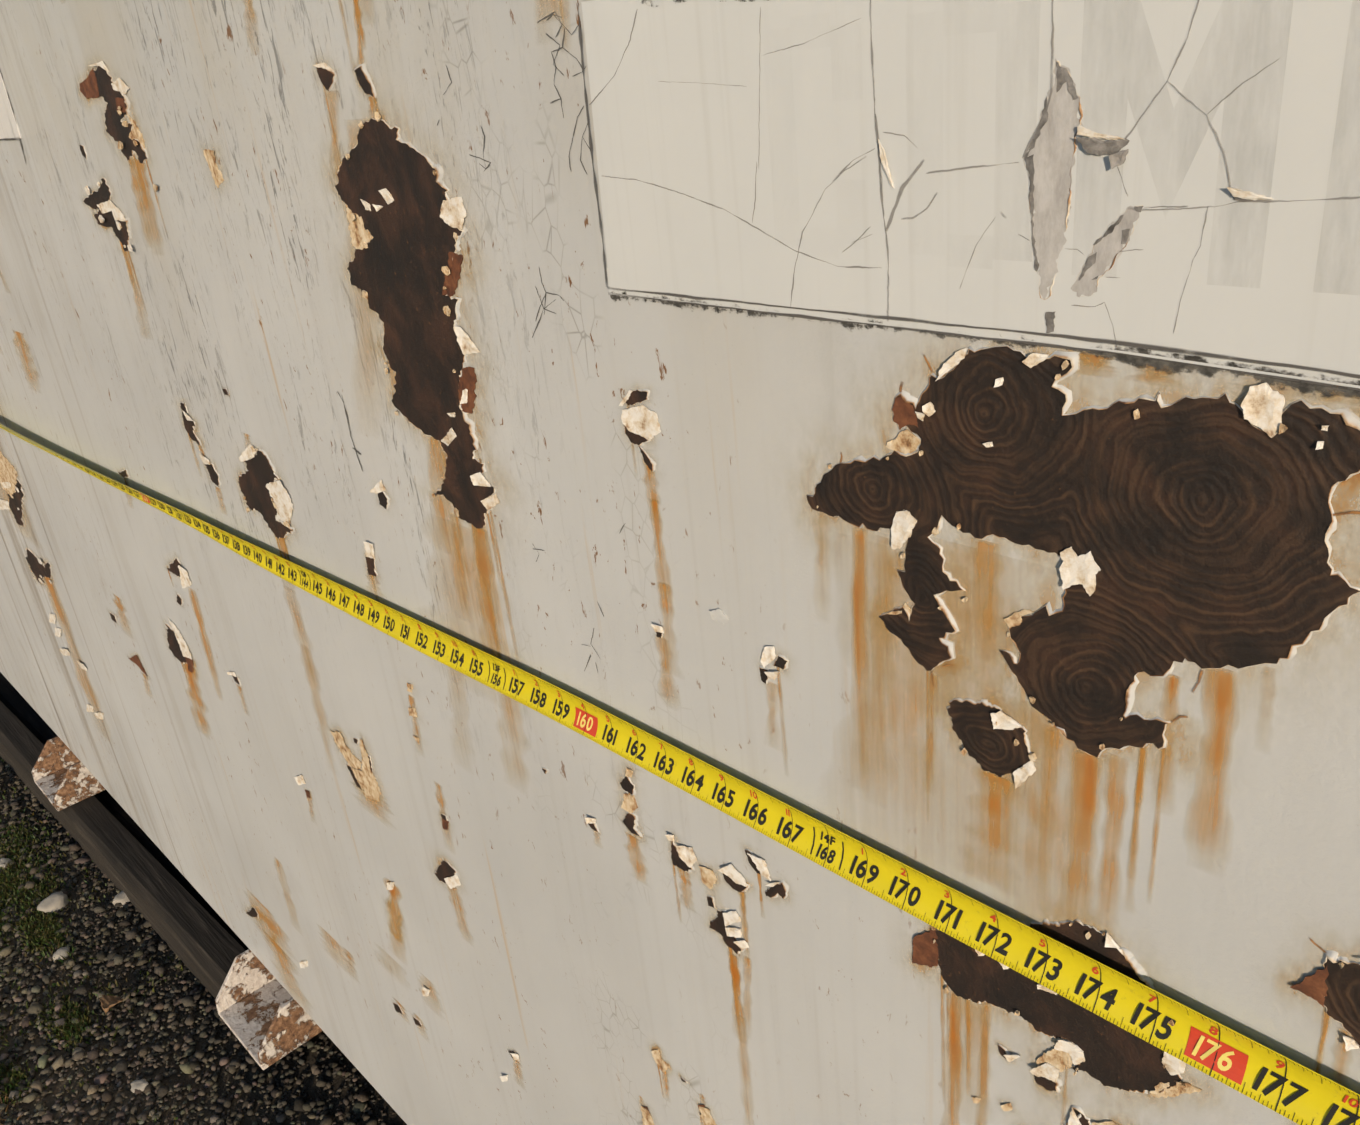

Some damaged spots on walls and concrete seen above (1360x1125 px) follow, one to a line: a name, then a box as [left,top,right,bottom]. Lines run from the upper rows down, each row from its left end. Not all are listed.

corrosion [619,389,661,560]
corrosion [651,584,668,669]
corrosion [807,345,1360,895]
corrosion [620,768,643,873]
corrosion [665,834,790,1026]